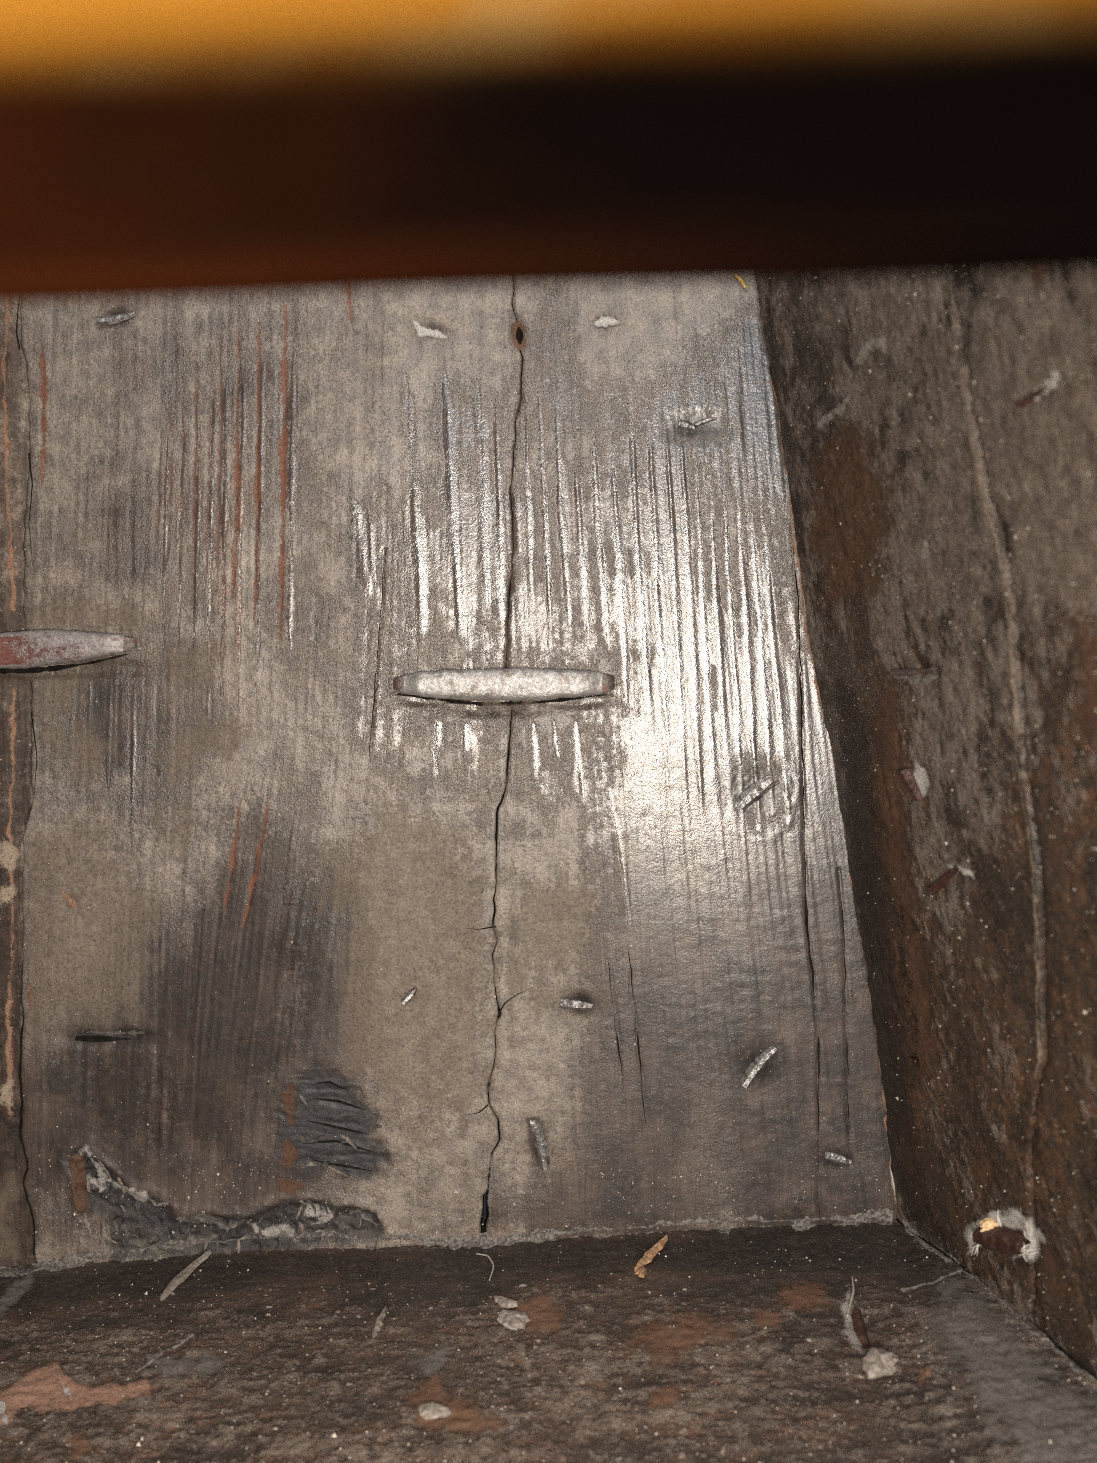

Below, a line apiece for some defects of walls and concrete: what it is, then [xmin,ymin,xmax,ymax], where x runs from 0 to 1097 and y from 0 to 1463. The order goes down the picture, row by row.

corrosion [0,636,79,665]
crack [506,292,527,660]
crack [468,701,534,1234]
spalling [69,1145,378,1263]